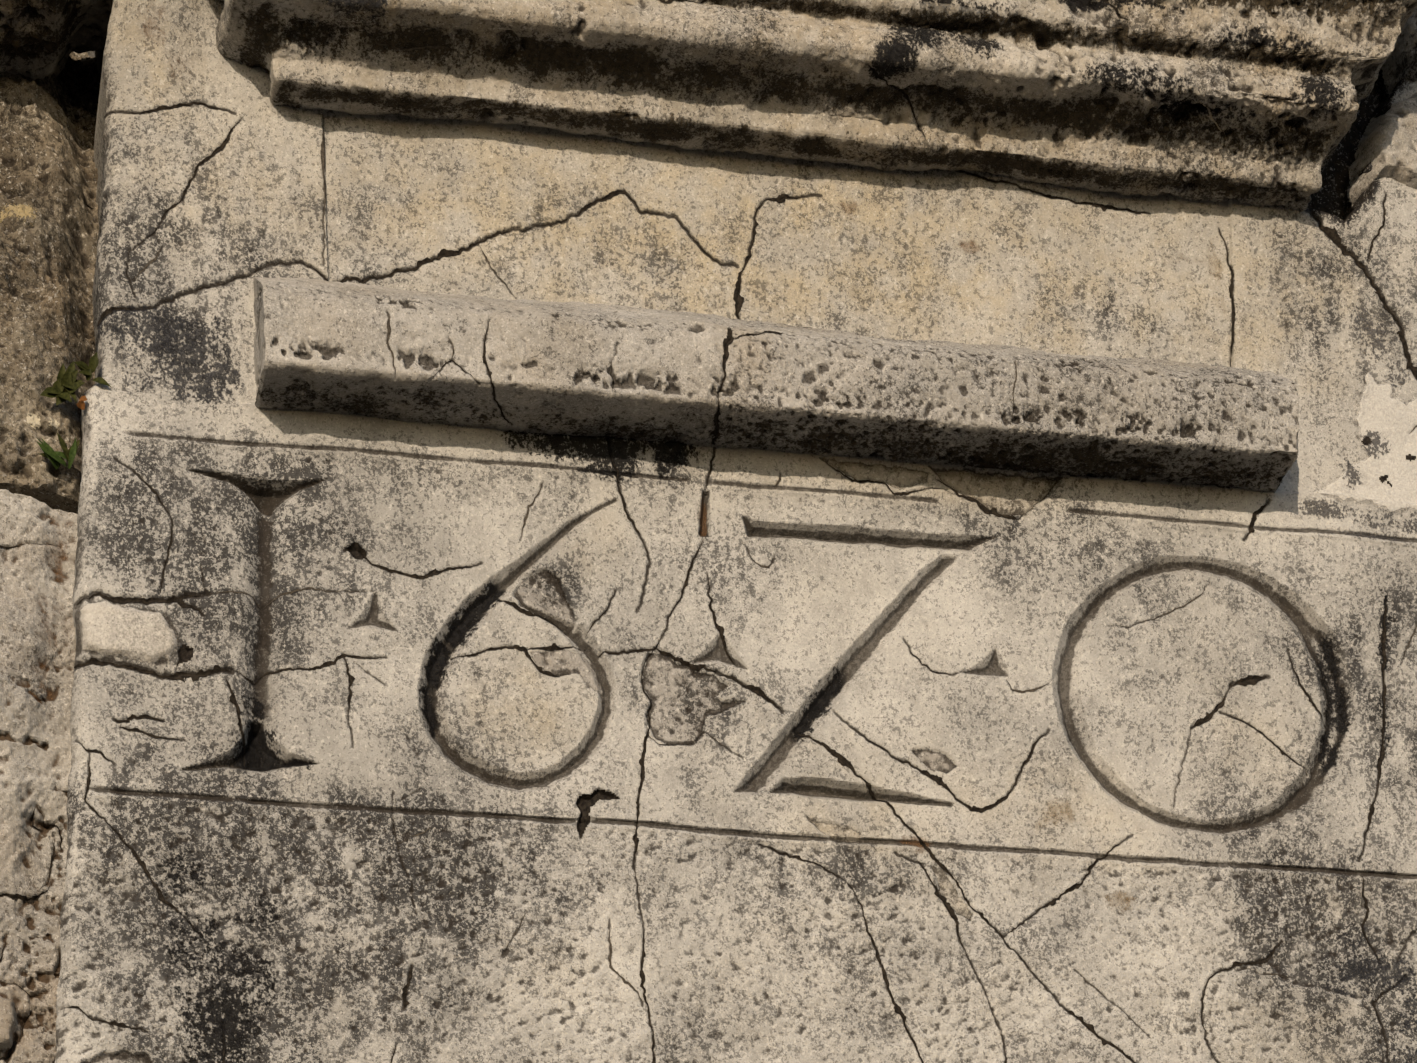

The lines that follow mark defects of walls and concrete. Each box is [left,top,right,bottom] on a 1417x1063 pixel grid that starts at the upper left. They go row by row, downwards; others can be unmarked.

leakage [282,0,387,53]
leakage [868,26,1004,80]
leakage [920,0,1009,11]
leakage [1044,0,1192,14]
leakage [1074,25,1347,124]
crack [95,102,811,490]
peeling [1318,372,1417,512]
crack [77,467,481,614]
crack [73,653,381,766]
spalling [643,654,737,745]
crack [452,444,1151,1063]
crack [1173,653,1324,809]